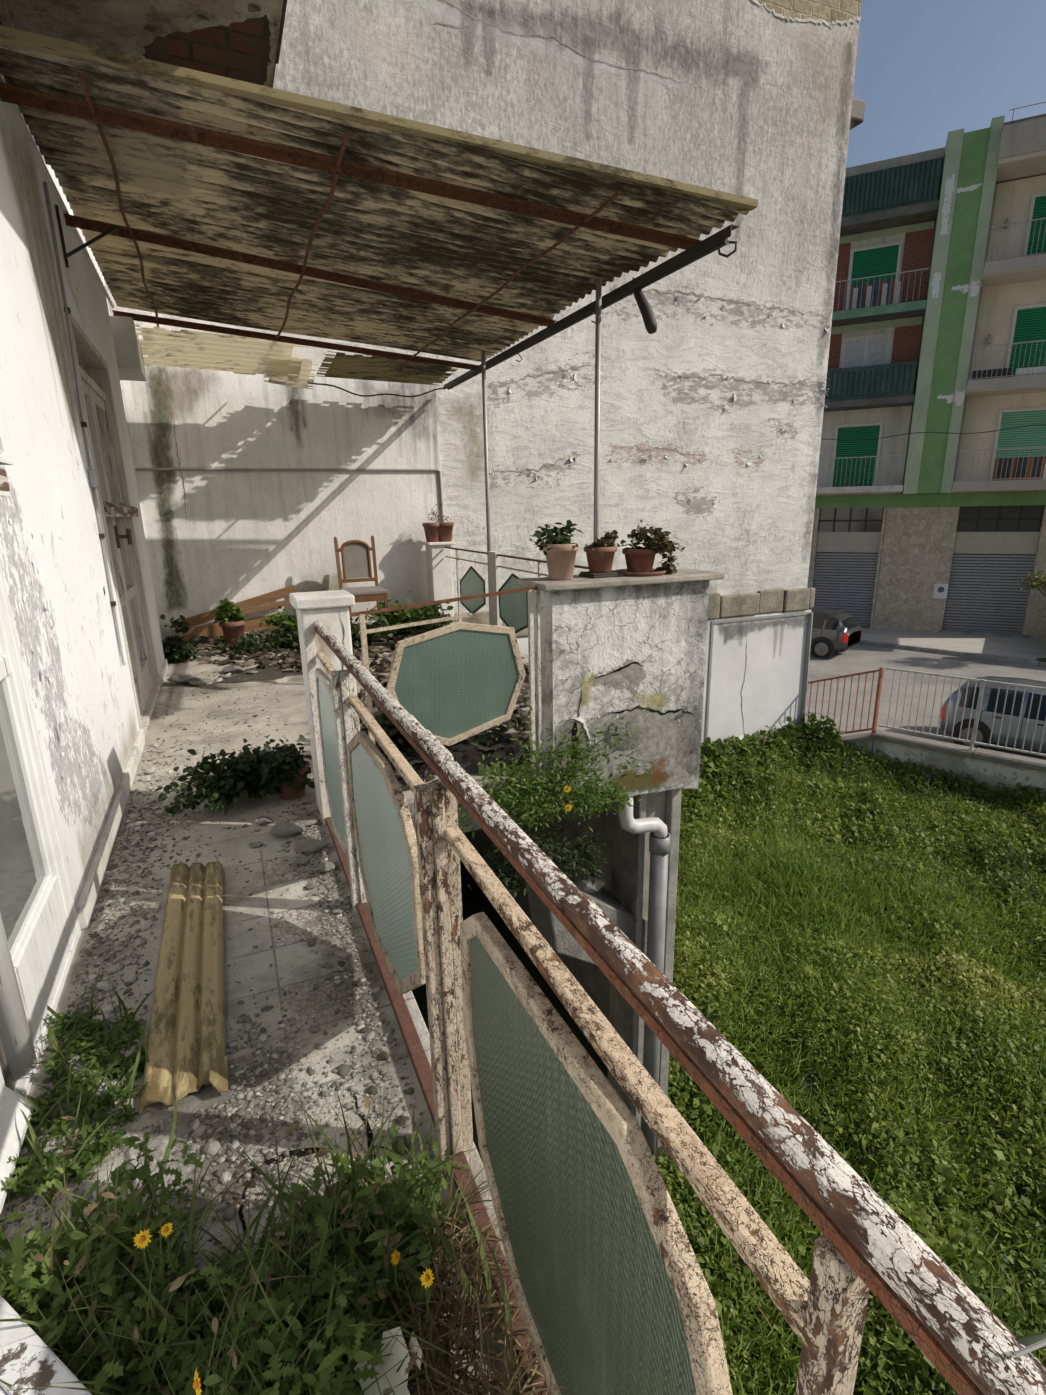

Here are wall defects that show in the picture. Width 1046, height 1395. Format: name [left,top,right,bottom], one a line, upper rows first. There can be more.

spalling [132,6,278,87]
damp [399,0,615,73]
spalling [751,0,861,29]
damp [149,369,197,608]
peeling [0,438,109,835]
spalling [554,658,796,793]
crack [350,1092,387,1171]
crack [234,1147,333,1240]